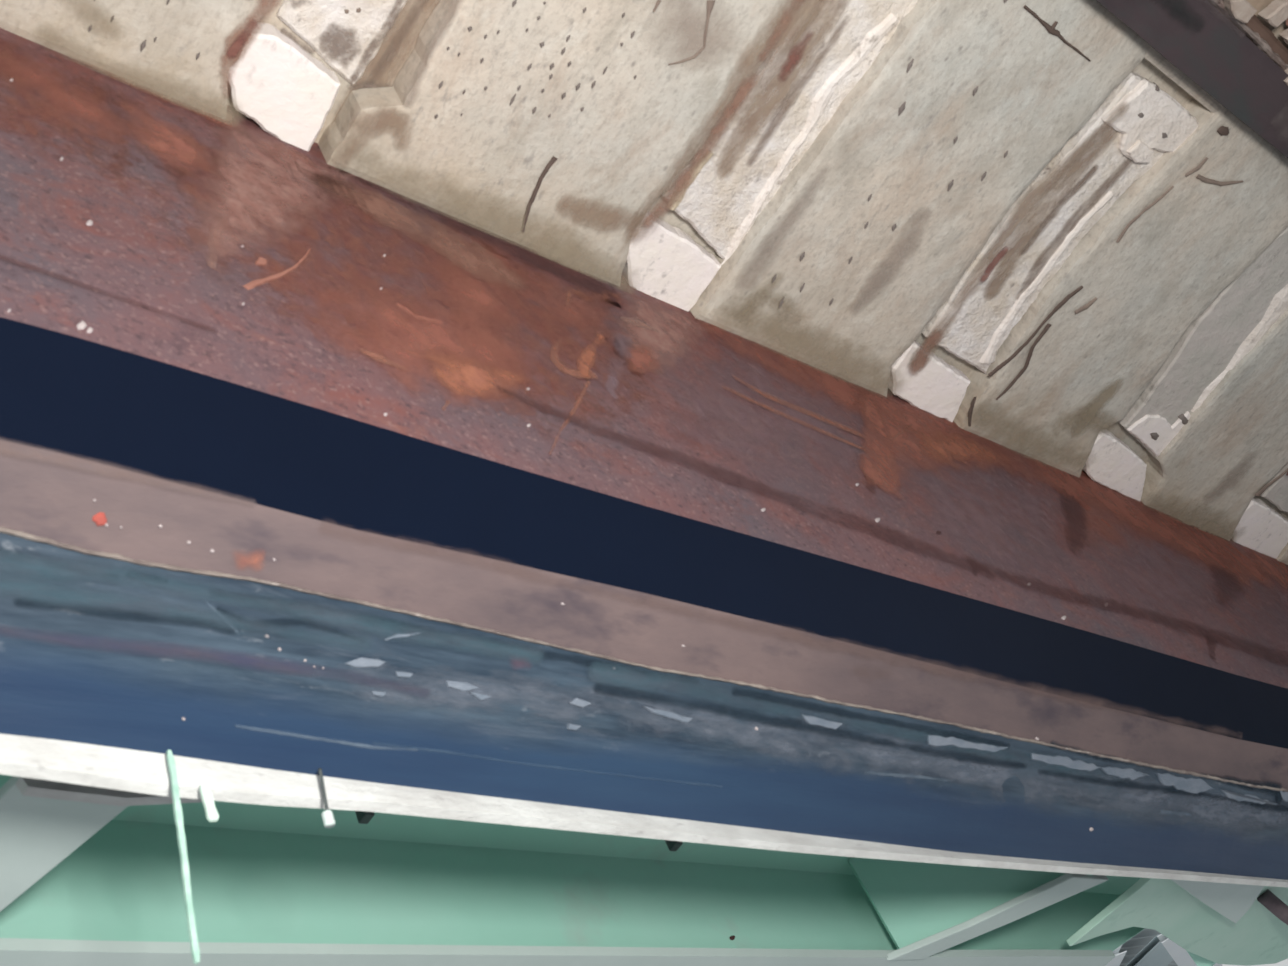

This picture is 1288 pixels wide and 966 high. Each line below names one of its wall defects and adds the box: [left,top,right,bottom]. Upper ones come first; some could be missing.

corrosion [222,0,277,83]
crack [668,0,715,65]
crack [522,156,557,232]
corrosion [630,0,840,238]
corrosion [911,105,1131,373]
spalling [979,191,1114,364]
spalling [1101,79,1199,163]
crack [1116,126,1243,243]
crack [968,286,1097,426]
corrosion [0,441,135,477]
corrosion [705,323,1288,586]
peeling [0,551,1288,830]